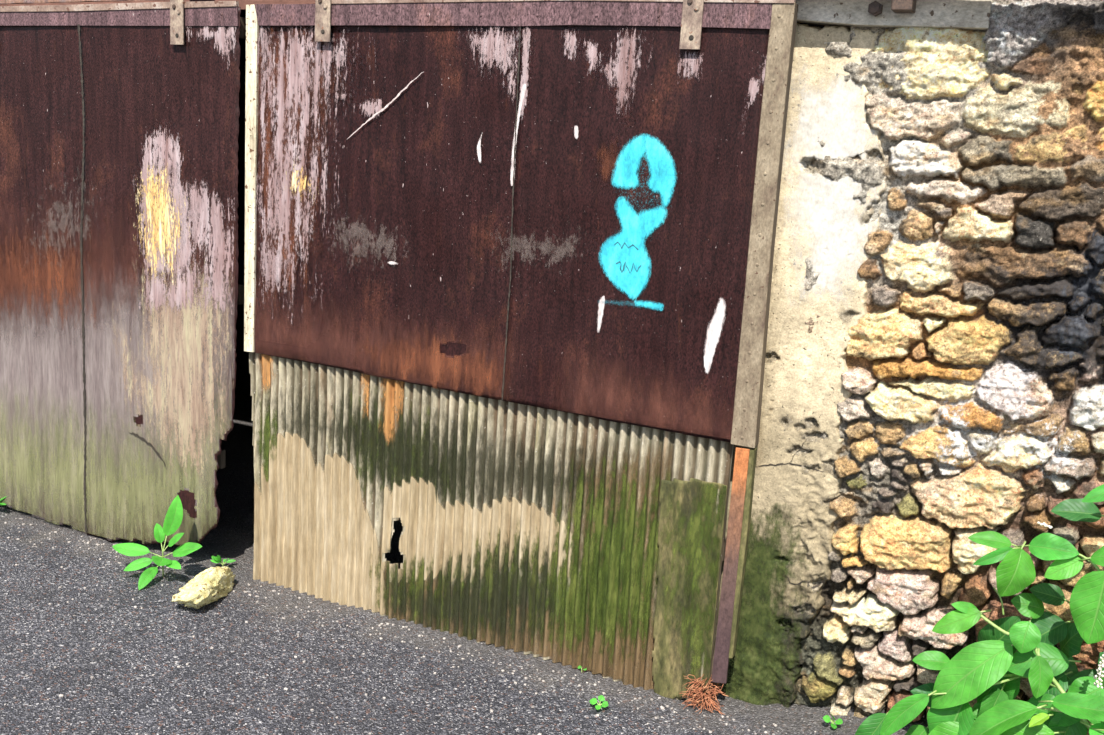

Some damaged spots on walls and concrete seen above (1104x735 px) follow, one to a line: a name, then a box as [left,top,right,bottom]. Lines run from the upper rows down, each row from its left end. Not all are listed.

peeling [468,26,531,118]
peeling [561,28,652,113]
peeling [677,52,703,84]
peeling [133,119,235,316]
corrosion [258,28,324,299]
peeling [254,26,382,324]
corrosion [602,146,616,179]
damp [120,268,229,473]
corrosion [261,354,274,389]
corrosion [361,336,505,440]
spalling [780,416,836,474]
damp [760,594,815,708]